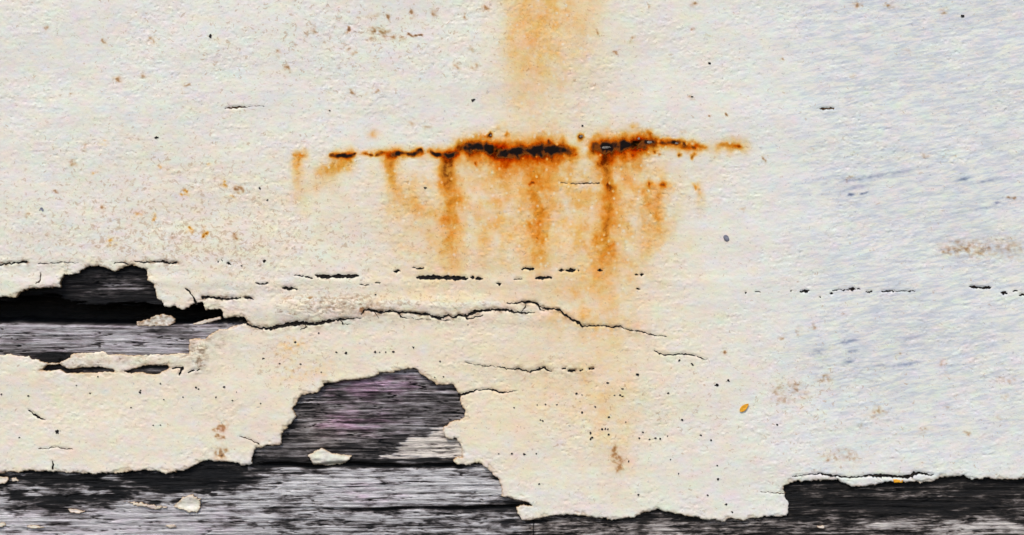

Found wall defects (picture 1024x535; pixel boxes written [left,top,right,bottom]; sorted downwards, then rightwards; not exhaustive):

corrosion [329,132,696,192]
peeling [0,265,248,390]
crack [185,259,703,359]
peeling [0,368,1024,535]